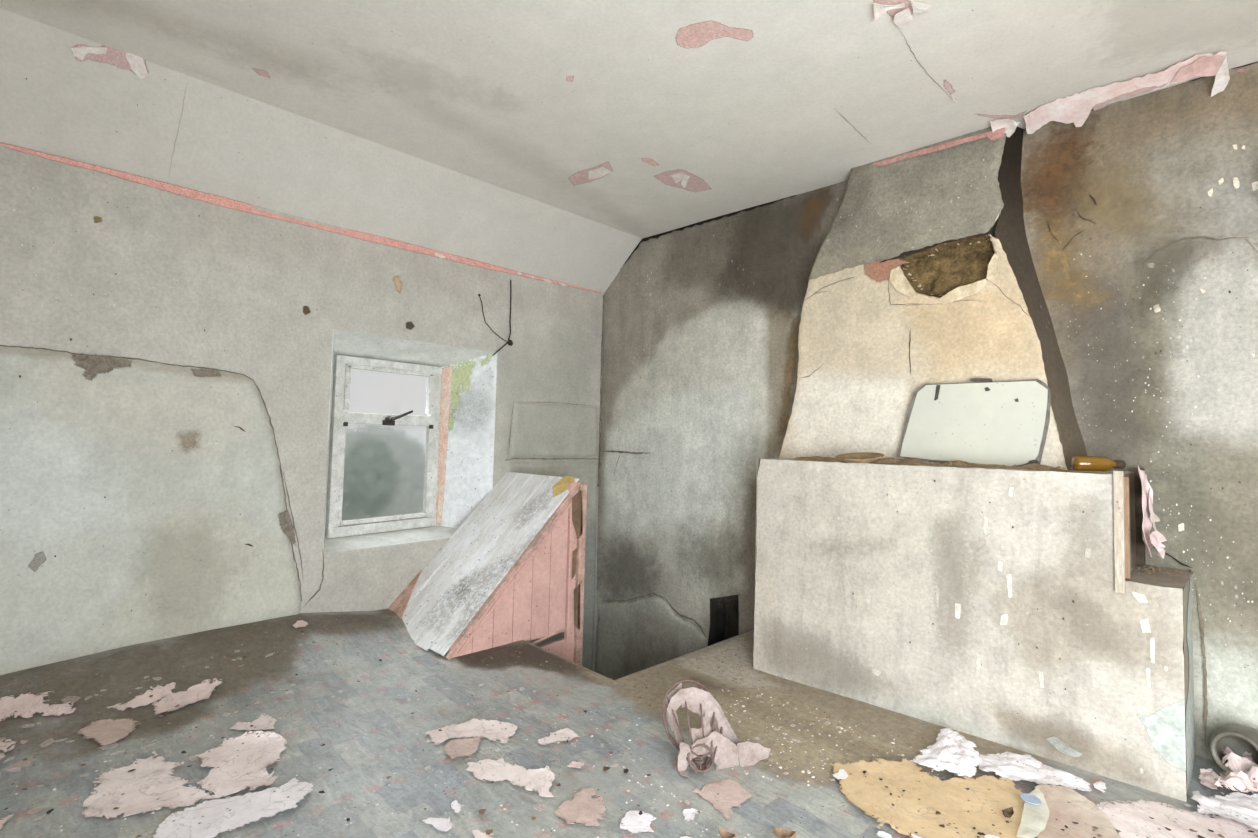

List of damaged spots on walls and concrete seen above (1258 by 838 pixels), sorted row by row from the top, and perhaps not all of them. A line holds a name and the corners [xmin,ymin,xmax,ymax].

peeling [873,0,931,29]
peeling [676,20,753,49]
peeling [71,45,149,79]
crack [901,33,953,100]
peeling [569,162,612,185]
peeling [641,158,711,192]
crack [1047,195,1097,251]
corrosion [1020,125,1144,302]
spalling [863,222,999,305]